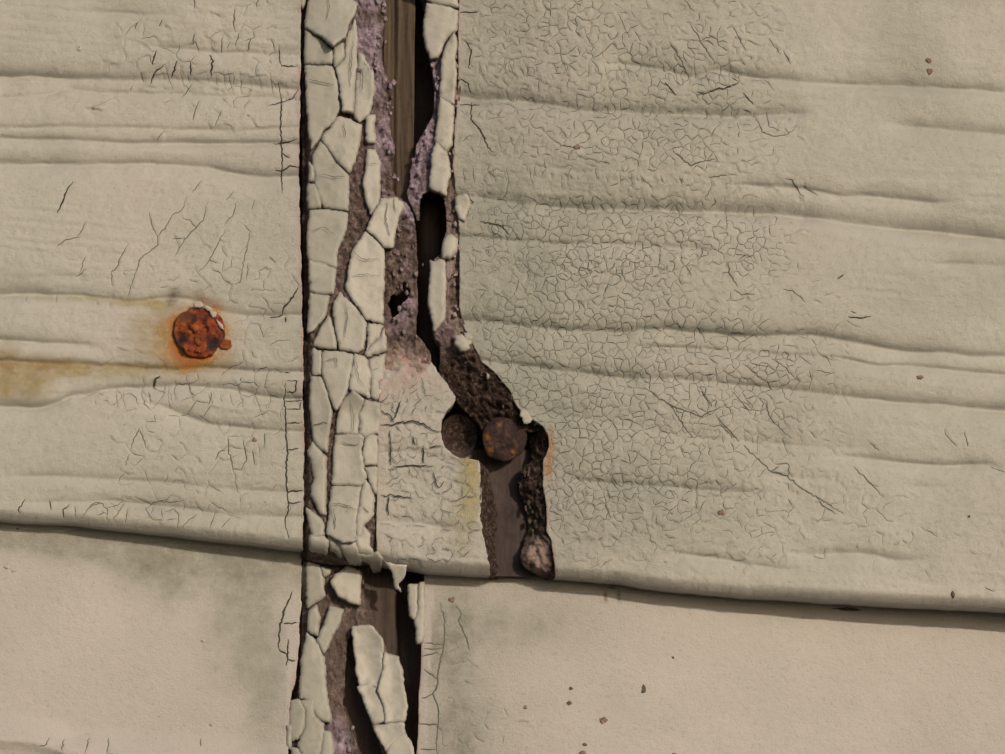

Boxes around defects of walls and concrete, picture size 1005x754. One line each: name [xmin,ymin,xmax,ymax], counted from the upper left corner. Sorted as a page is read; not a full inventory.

crack [92,0,363,191]
peeling [422,0,471,222]
corrosion [125,300,215,371]
crack [49,181,326,538]
peeling [286,0,426,754]
crack [327,304,478,568]
peeling [427,234,458,332]
spalling [439,331,555,580]